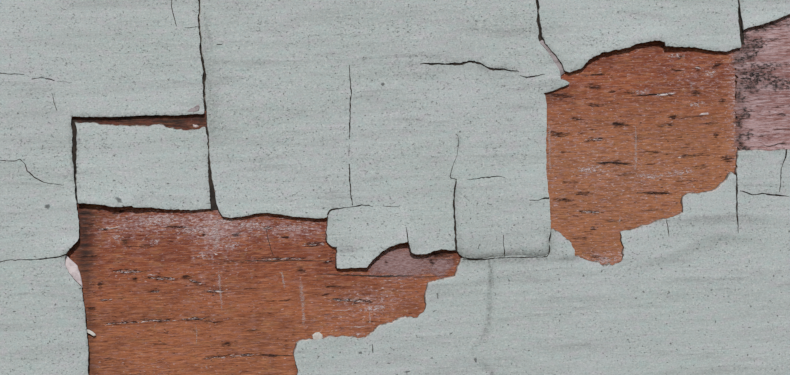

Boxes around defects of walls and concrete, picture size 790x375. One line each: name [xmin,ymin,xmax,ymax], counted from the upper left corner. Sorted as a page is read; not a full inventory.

crack [420,0,565,78]
crack [737,6,745,45]
crack [0,73,79,204]
crack [171,0,222,211]
crack [346,66,354,145]
peeling [544,16,790,265]
crack [0,254,67,262]
peeling [65,104,462,375]
crack [327,164,397,215]
crack [450,140,551,260]
crack [735,149,788,225]